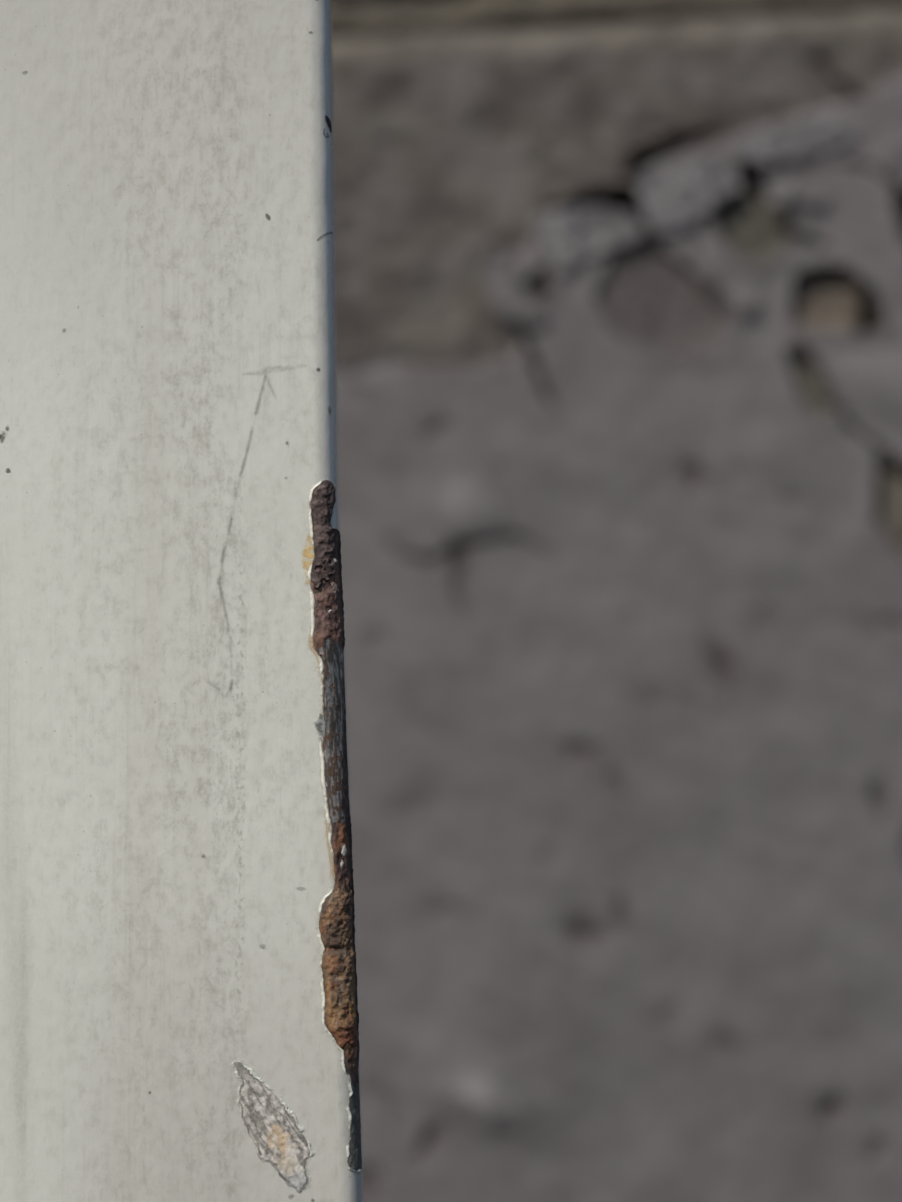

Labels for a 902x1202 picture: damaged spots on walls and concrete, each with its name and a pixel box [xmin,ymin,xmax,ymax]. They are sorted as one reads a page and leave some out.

peeling [231,1062,315,1193]
rust [303,480,362,1174]